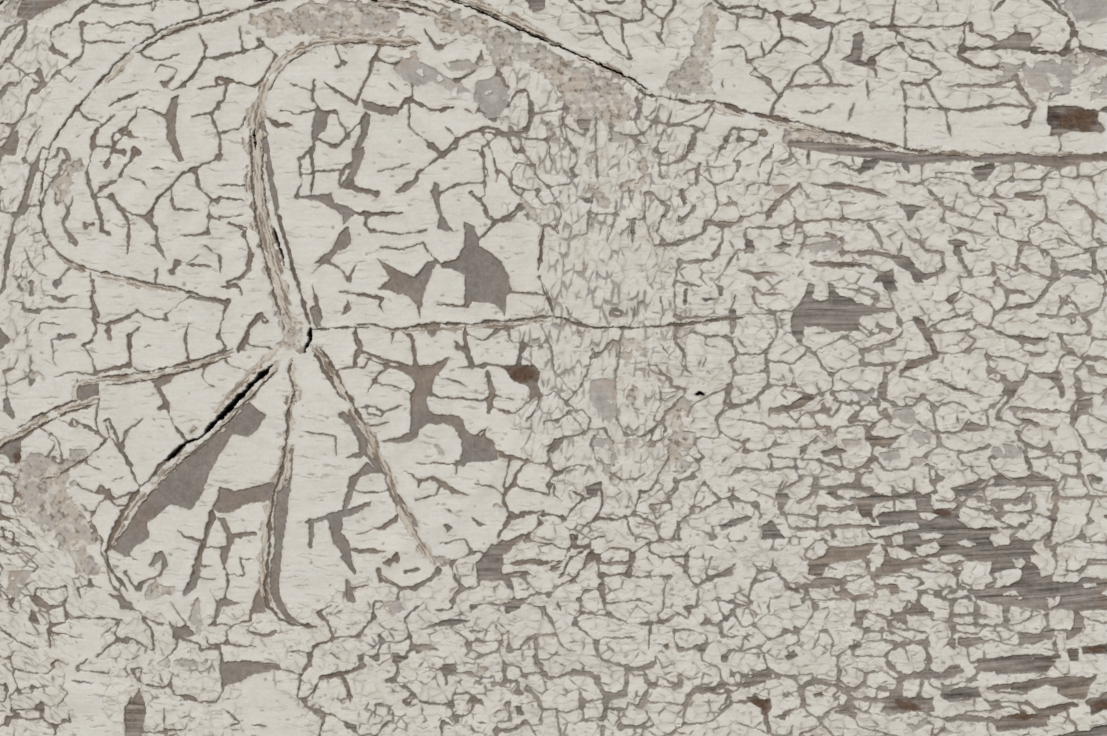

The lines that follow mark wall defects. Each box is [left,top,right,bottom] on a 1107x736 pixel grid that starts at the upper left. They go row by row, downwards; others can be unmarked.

peeling [0,0,78,24]
crack [280,79,380,200]
crack [314,249,385,314]
crack [352,210,449,269]
peeling [377,183,512,338]
peeling [791,284,894,346]
crack [744,194,946,314]
peeling [874,243,927,293]
peeling [352,334,497,467]
peeling [109,402,276,638]
crack [436,539,486,612]
crack [915,685,1041,736]